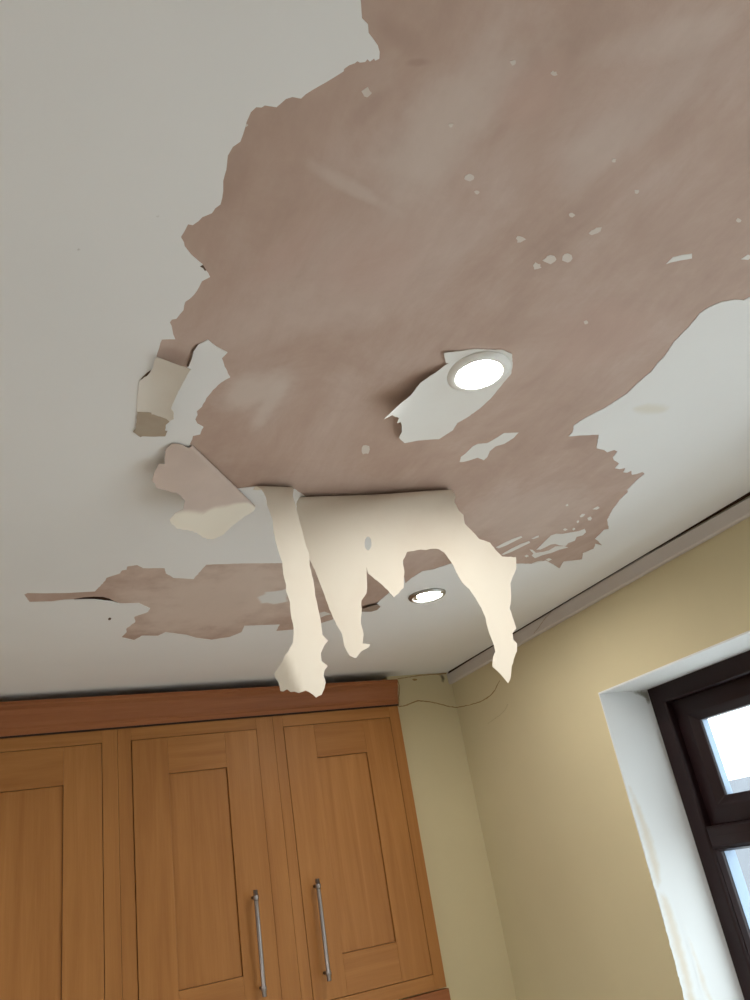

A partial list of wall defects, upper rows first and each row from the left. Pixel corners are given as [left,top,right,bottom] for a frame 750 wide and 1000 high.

peeling [133,0,750,568]
peeling [25,563,294,640]
peeling [310,561,333,623]
peeling [361,567,389,612]
peeling [403,549,452,583]
crack [398,492,750,723]